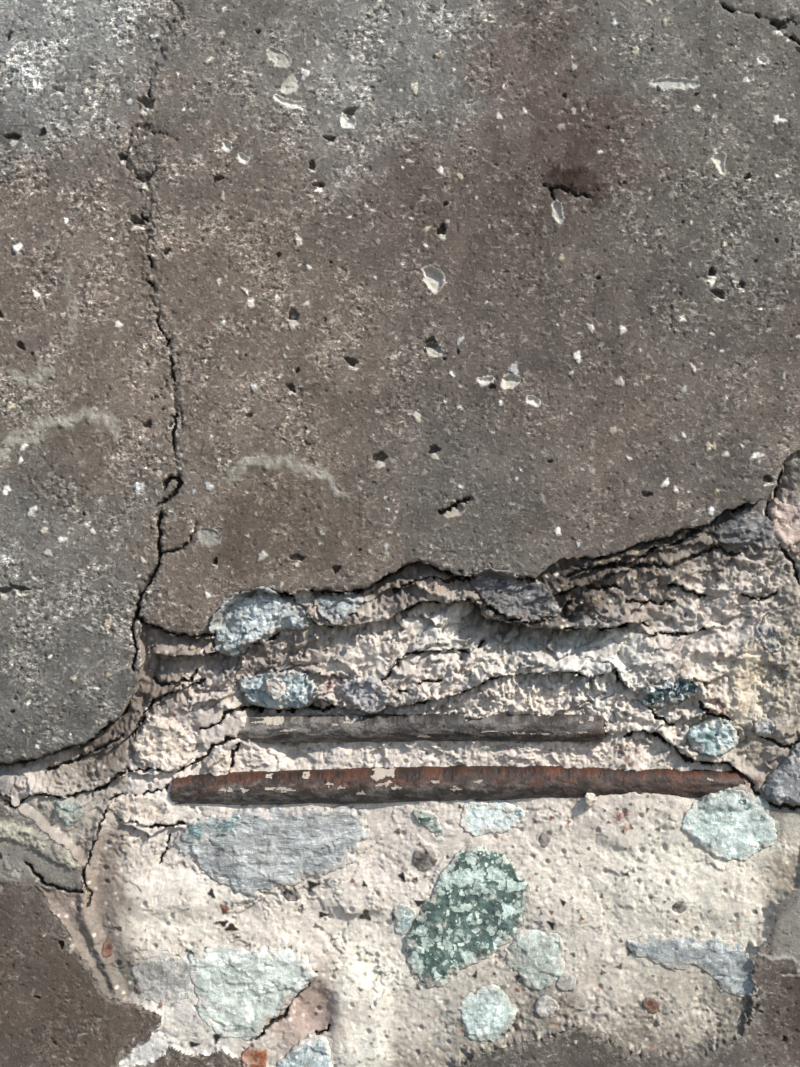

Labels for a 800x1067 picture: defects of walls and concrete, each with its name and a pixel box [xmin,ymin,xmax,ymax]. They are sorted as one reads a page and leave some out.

crack [722,4,760,18]
crack [156,317,176,381]
crack [171,412,179,450]
crack [130,476,215,670]
spalling [0,450,800,1067]
crack [0,794,18,810]
crack [25,862,83,894]